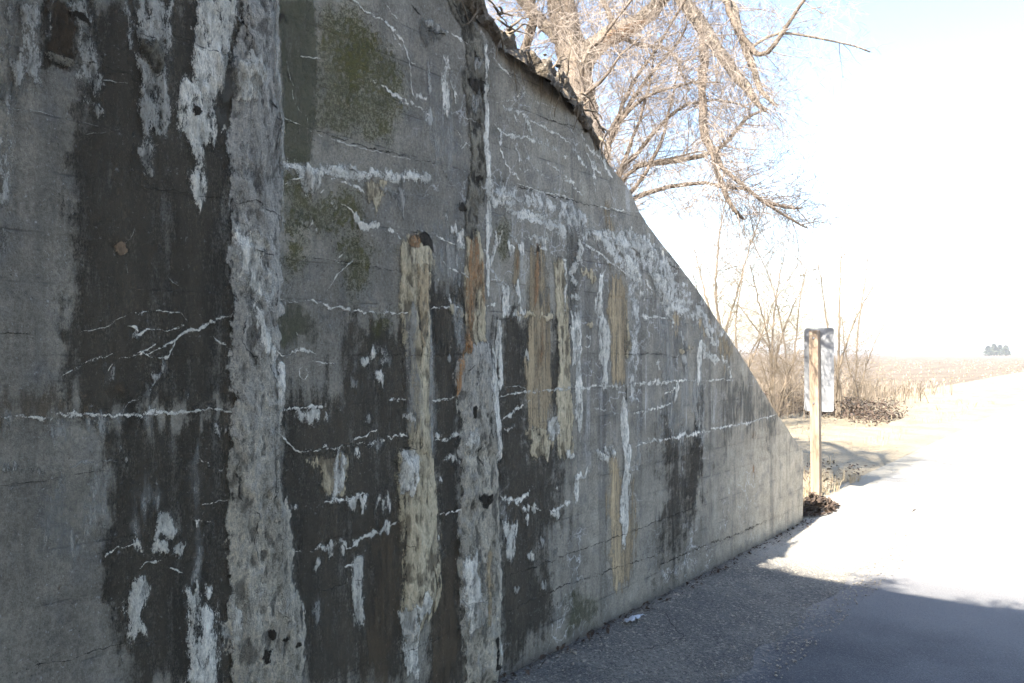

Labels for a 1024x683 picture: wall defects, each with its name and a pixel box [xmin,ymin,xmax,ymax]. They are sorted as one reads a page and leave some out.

leakage [283,55,452,239]
crack [0,406,232,486]
leakage [0,0,245,683]
crack [62,310,230,376]
crack [277,243,408,315]
leakage [280,215,469,683]
crack [356,294,465,356]
corrosion [512,244,554,430]
corrosion [606,263,628,392]
corrosion [605,448,638,593]
leakage [481,176,776,671]
crack [497,352,775,464]